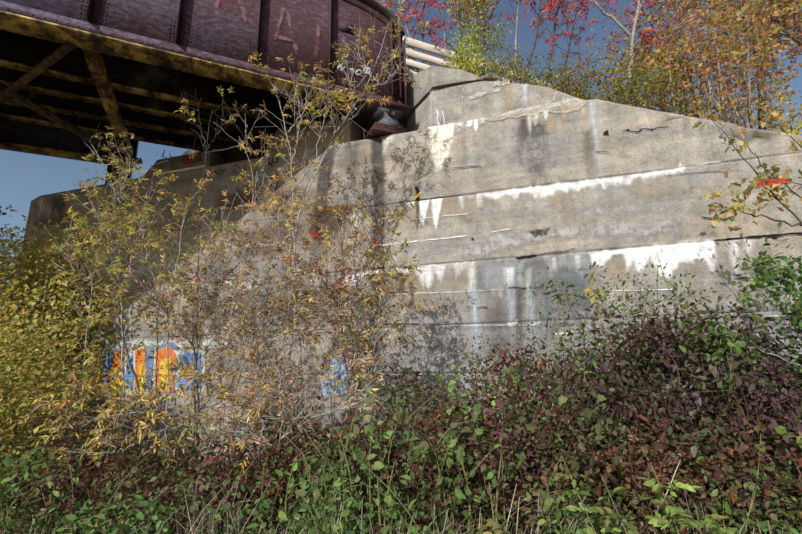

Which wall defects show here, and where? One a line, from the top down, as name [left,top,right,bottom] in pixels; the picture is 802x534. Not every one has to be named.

water stain [428,109,478,168]
water stain [581,100,598,143]
crack [623,116,684,132]
water stain [454,161,739,205]
water stain [341,137,392,301]
water stain [590,239,715,280]
water stain [505,262,544,342]